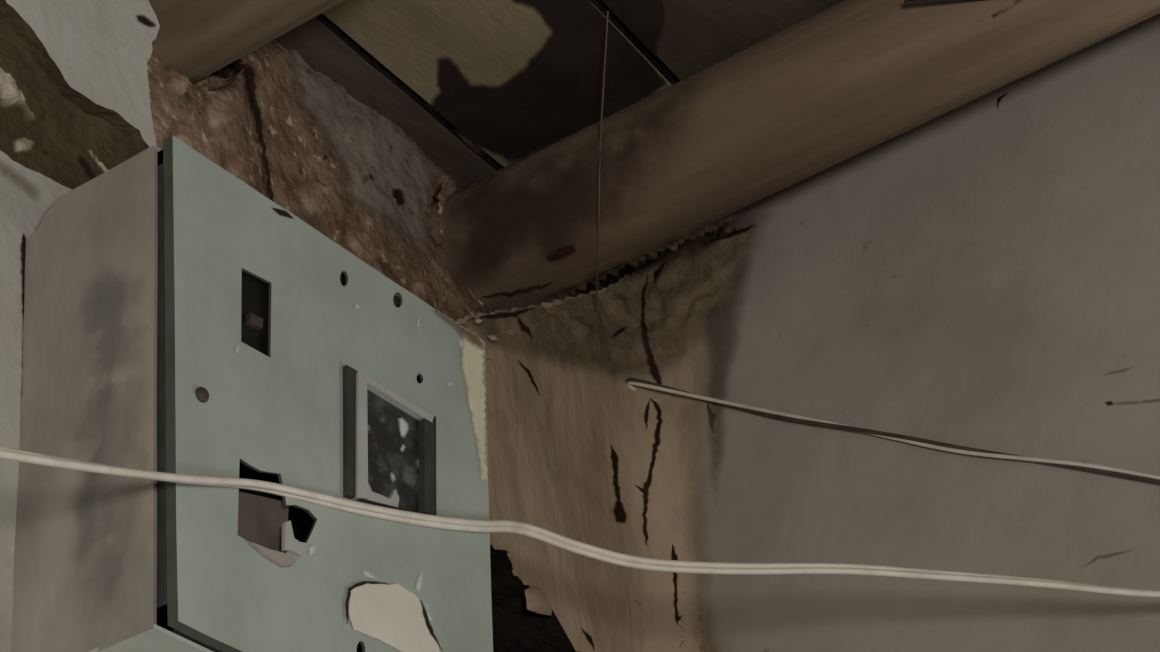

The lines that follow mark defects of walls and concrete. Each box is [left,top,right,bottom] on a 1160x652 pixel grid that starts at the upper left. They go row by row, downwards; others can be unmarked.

flaking render [137,15,156,27]
flaking render [0,18,137,190]
crack [209,59,274,202]
spalling [393,189,404,205]
crack [611,275,681,625]
spalling [525,585,552,616]